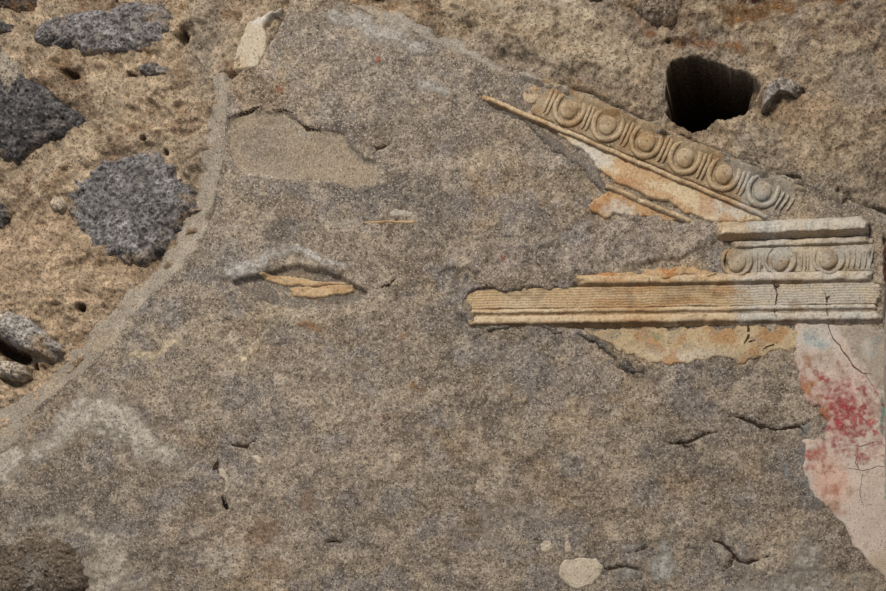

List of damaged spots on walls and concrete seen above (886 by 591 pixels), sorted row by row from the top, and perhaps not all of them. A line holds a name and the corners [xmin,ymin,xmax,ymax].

spalling [172,25,191,48]
peeling [233,0,301,72]
spalling [56,65,81,82]
spalling [228,106,378,187]
spalling [589,187,677,221]
spalling [236,270,365,308]
spalling [72,300,88,314]
spalling [0,341,40,372]
crack [825,294,882,404]
crack [670,416,807,447]
crack [848,441,884,506]
crack [712,540,769,572]